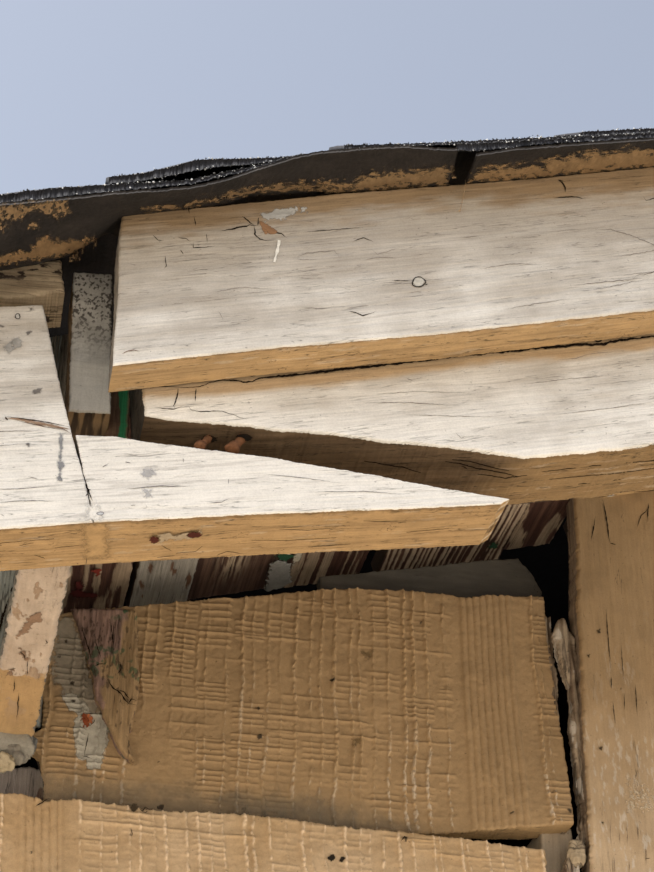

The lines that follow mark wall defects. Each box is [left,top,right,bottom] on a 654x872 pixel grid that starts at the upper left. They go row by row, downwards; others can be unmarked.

peeling [16,612,43,637]
peeling [62,581,140,766]